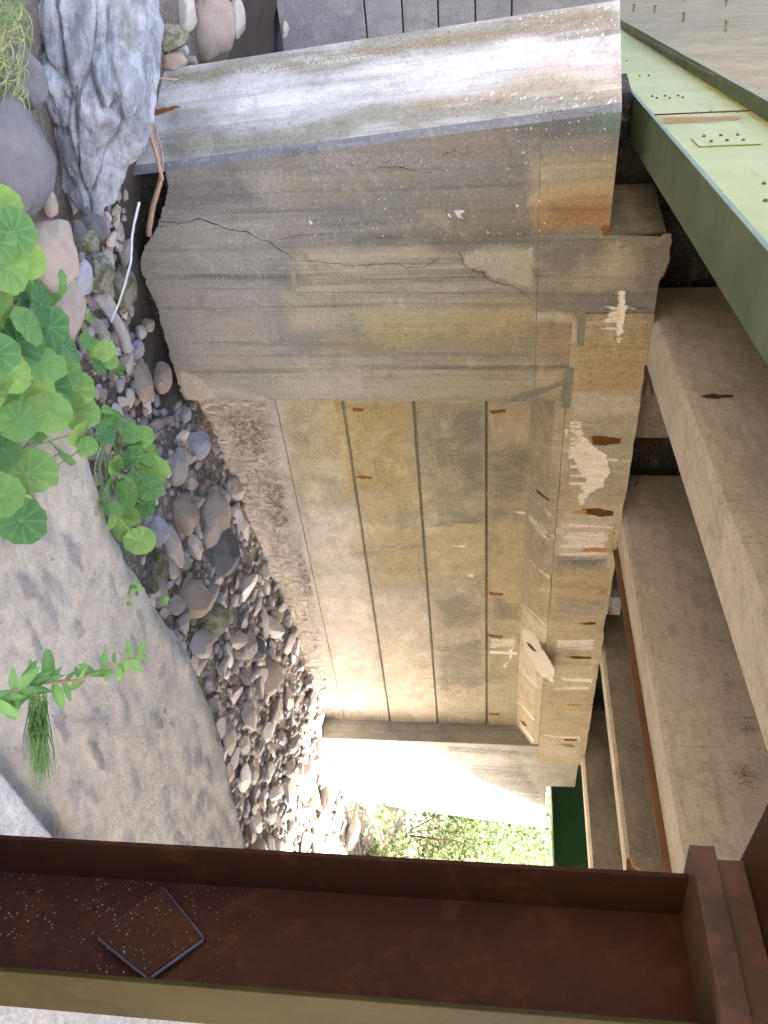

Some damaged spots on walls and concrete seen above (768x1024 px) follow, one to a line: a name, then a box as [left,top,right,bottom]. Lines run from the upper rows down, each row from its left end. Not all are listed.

rust [154,105,182,116]
crack [156,218,534,301]
damp [162,182,665,352]
spalling [462,221,548,288]
rust [587,435,622,446]
damp [567,451,618,505]
rust [573,508,614,517]